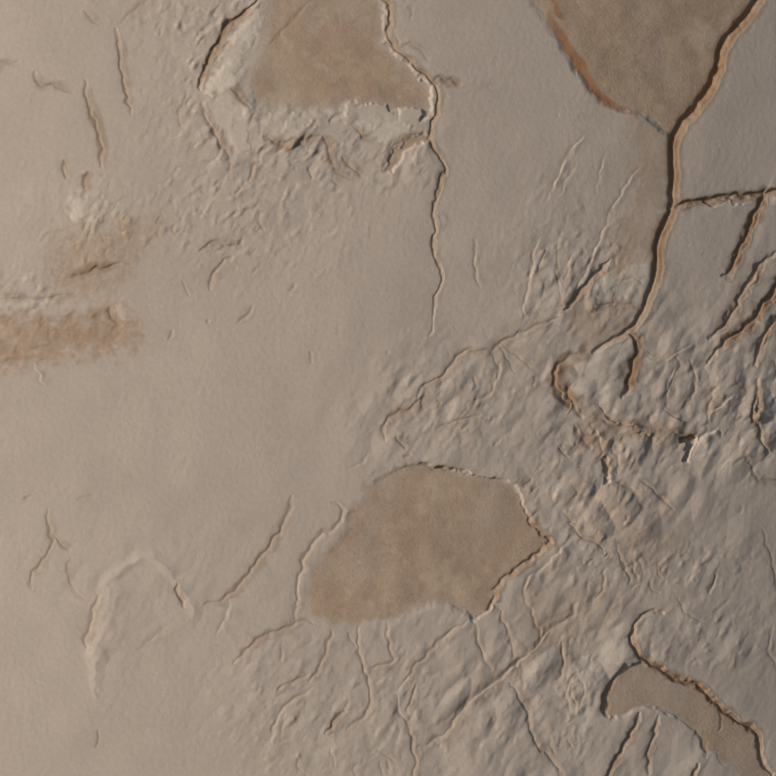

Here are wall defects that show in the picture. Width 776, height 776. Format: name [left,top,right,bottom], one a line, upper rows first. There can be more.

water stain [0,201,178,387]
crack [199,236,245,292]
crack [197,0,263,185]
crack [263,134,363,178]
spalling [206,0,435,176]
crack [353,0,463,337]
crack [379,0,776,486]
spalling [523,0,752,145]
crack [28,507,72,591]
spalling [301,460,556,631]
spalling [604,661,771,776]